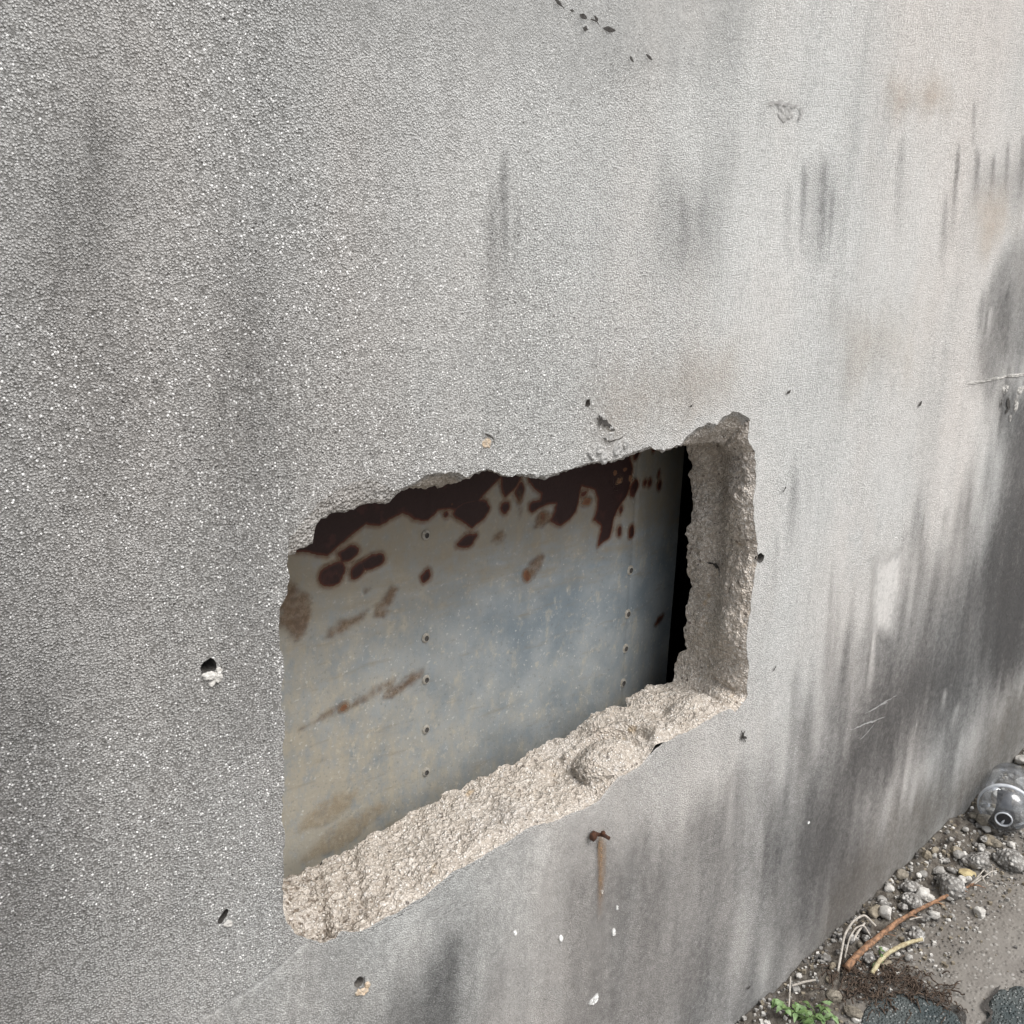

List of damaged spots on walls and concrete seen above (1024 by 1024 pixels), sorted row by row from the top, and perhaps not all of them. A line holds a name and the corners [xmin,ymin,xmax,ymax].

flaking render [585,399,629,465]
rust [296,449,662,587]
rust [280,586,310,638]
leakage [772,380,1024,958]